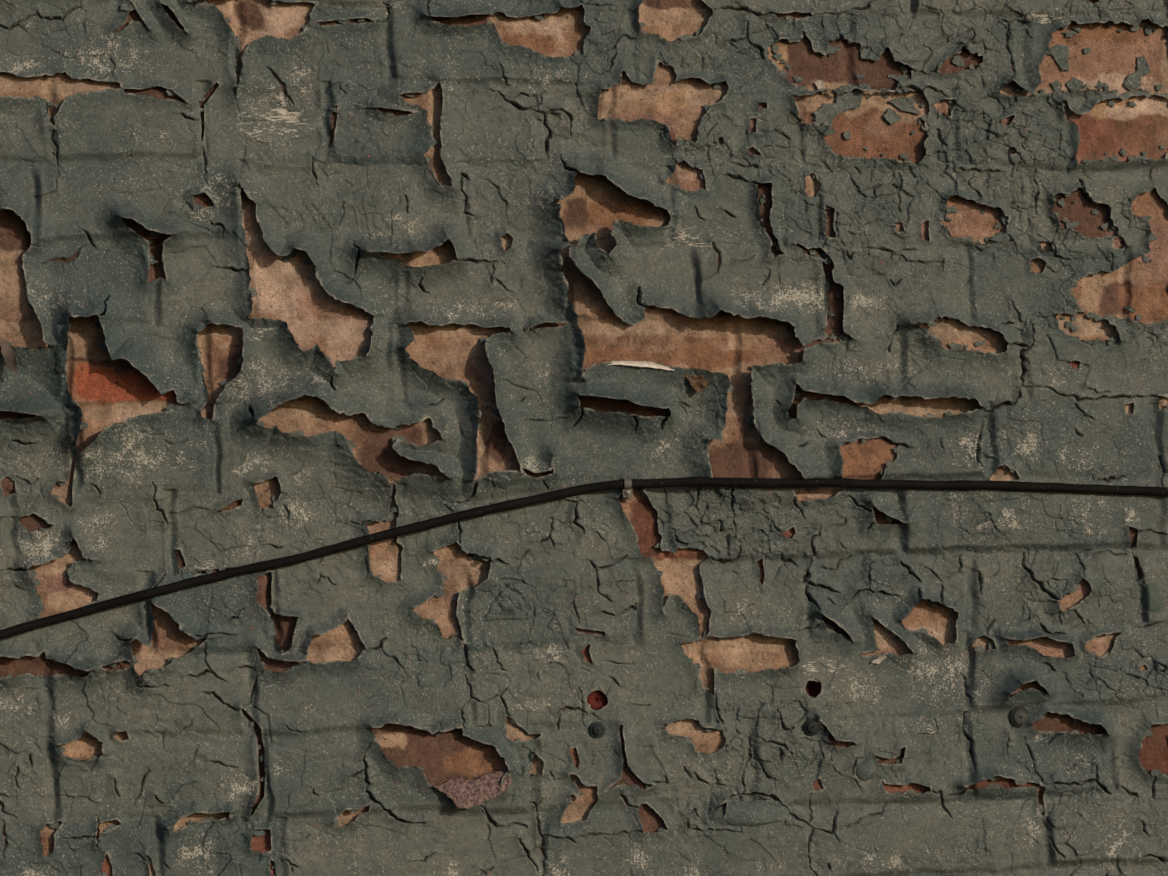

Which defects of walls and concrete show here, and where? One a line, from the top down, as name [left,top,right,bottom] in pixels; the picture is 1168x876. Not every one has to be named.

crack [502,74,571,171]
peeling [1000,19,1168,164]
peeling [51,315,185,506]
peeling [197,188,374,420]
peeling [405,321,553,481]
peeling [533,173,901,501]
crack [976,312,1033,461]
peeling [618,488,799,695]
crack [781,498,889,603]
crack [350,762,405,822]
crack [486,792,628,870]
crack [690,705,790,831]